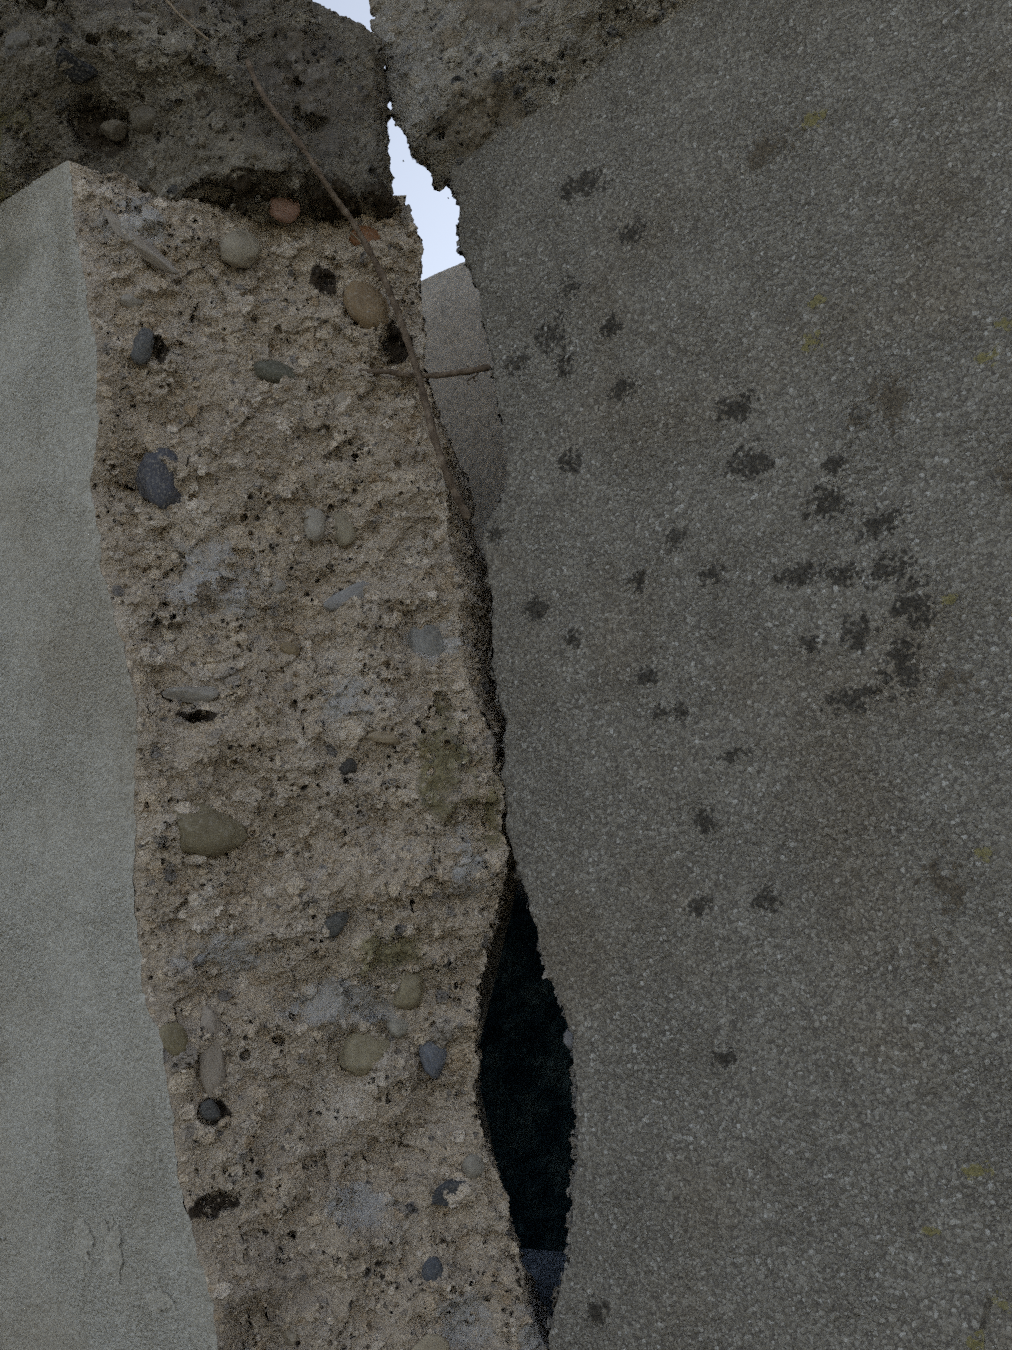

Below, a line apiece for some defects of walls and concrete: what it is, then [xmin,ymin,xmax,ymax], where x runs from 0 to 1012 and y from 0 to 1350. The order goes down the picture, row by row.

spalling [447,178,477,289]
spalling [536,940,579,1347]